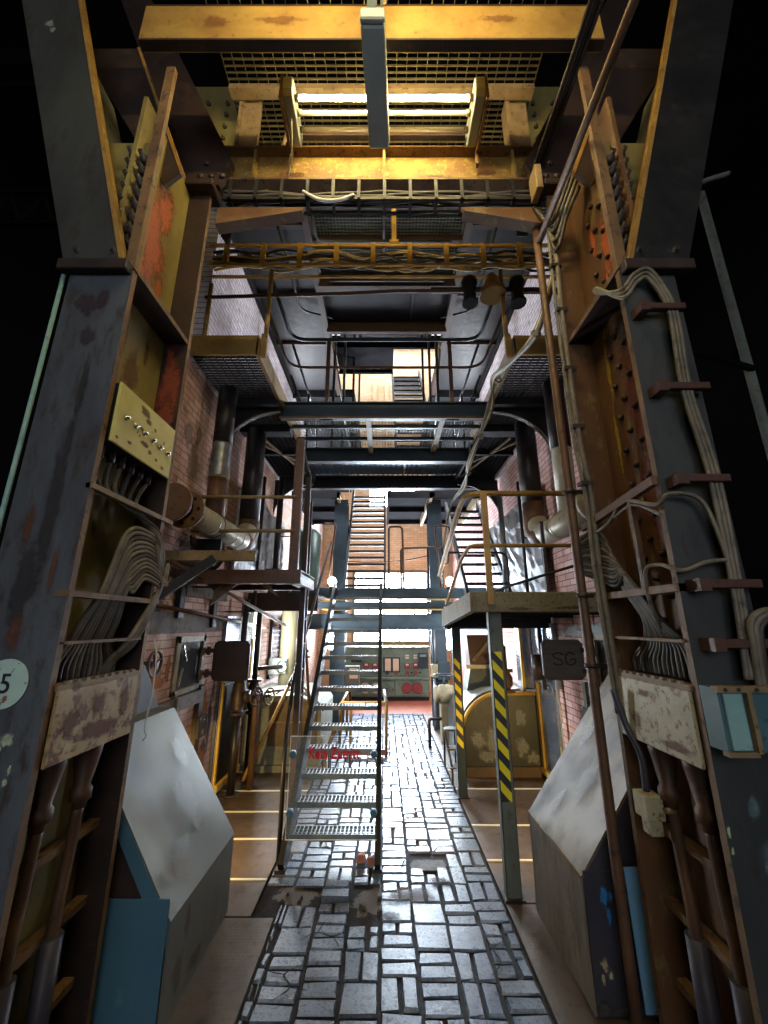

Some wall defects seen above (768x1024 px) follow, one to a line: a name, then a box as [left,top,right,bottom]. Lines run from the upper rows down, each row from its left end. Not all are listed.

corrosion [590,220,613,280]
spalling [349,883,383,918]